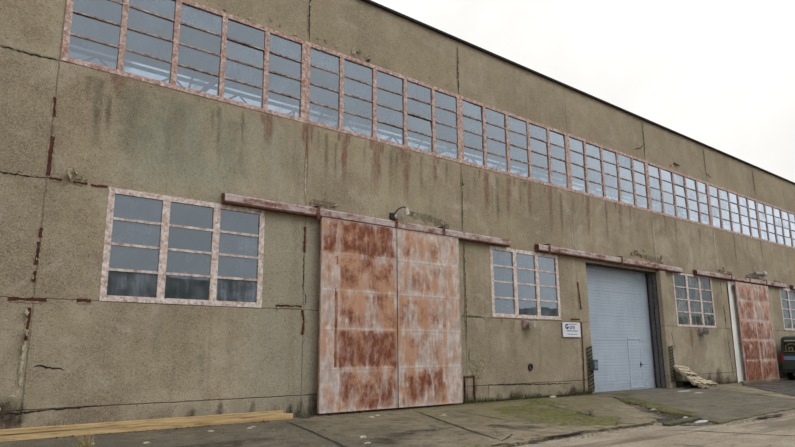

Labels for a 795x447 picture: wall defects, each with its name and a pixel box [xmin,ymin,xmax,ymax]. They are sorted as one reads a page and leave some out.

crack [0,339,104,415]